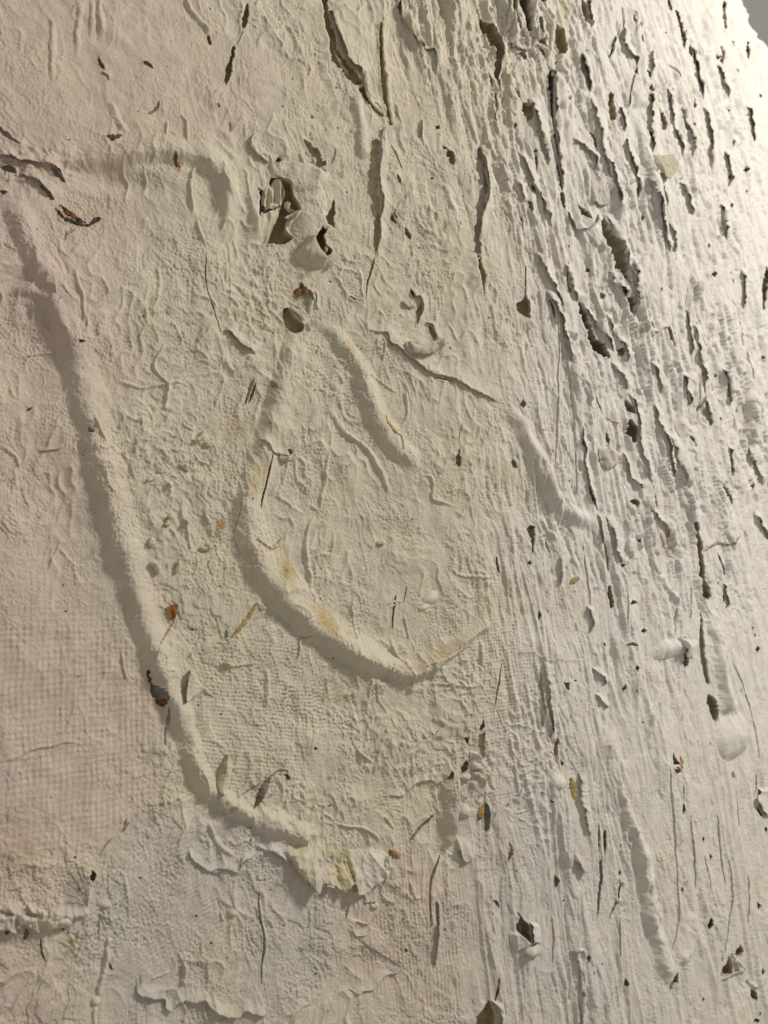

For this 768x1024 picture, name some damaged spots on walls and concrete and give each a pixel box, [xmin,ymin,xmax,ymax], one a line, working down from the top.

peeling [314,0,340,117]
peeling [0,142,65,199]
spalling [250,132,338,269]
spalling [434,124,461,167]
peeling [506,0,751,486]
hole [280,286,317,334]
peeling [370,286,504,402]
peeling [580,424,651,568]
peeling [748,443,768,490]
peeling [754,787,768,834]
peeling [188,838,392,908]
peeling [136,968,266,1019]